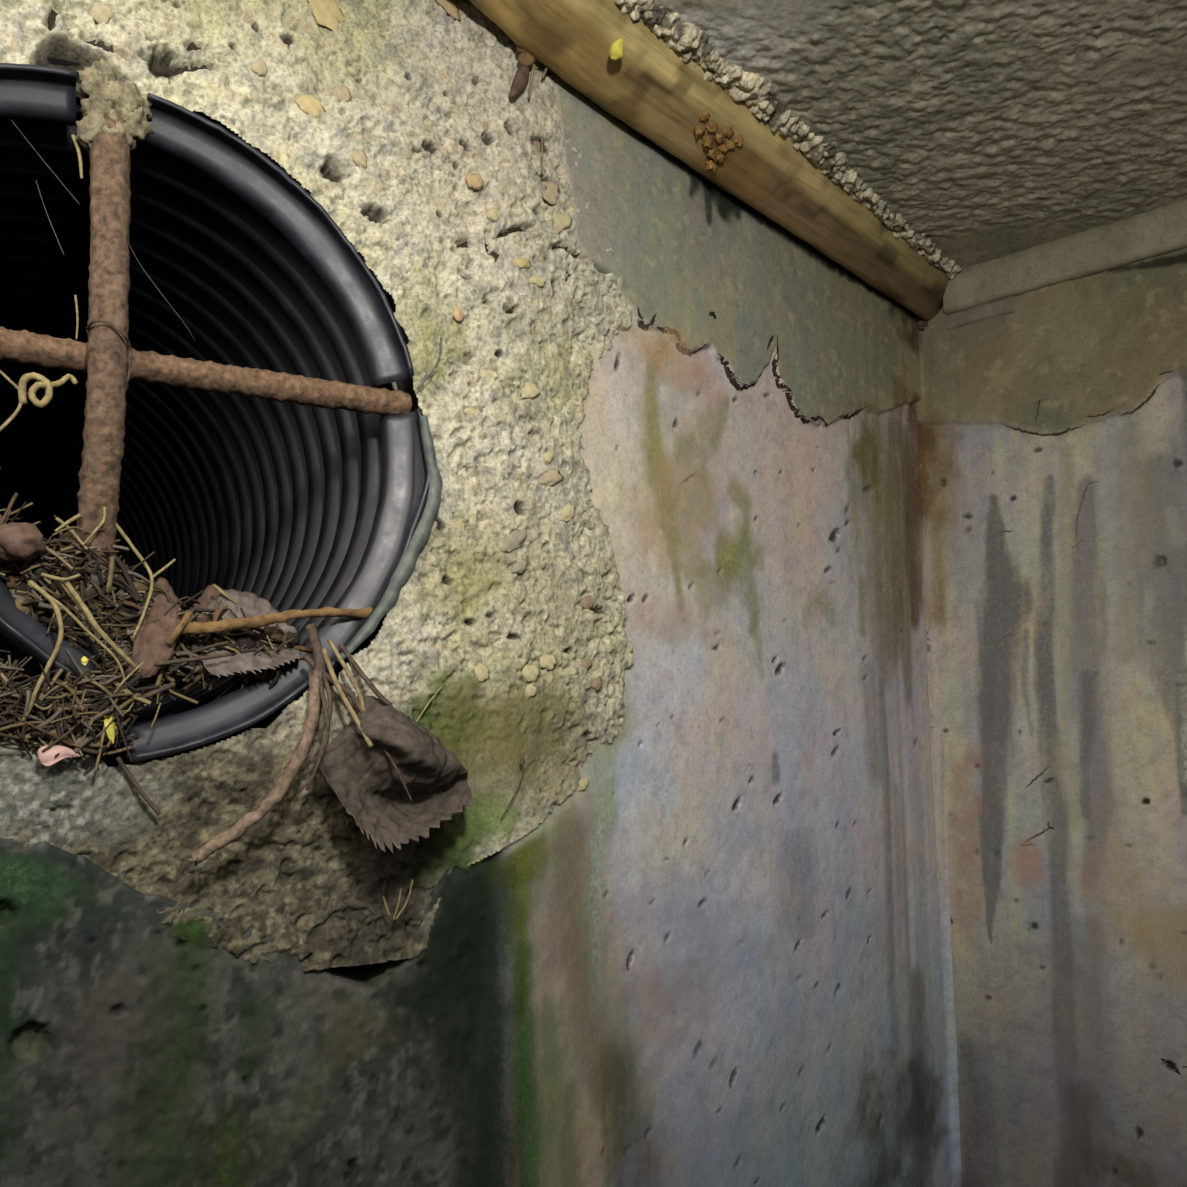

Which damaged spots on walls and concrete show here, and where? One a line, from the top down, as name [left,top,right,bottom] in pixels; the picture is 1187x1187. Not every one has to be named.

spalling [0,0,647,971]
water stain [954,450,1108,943]
water stain [1148,458,1187,814]
water stain [505,837,557,1187]